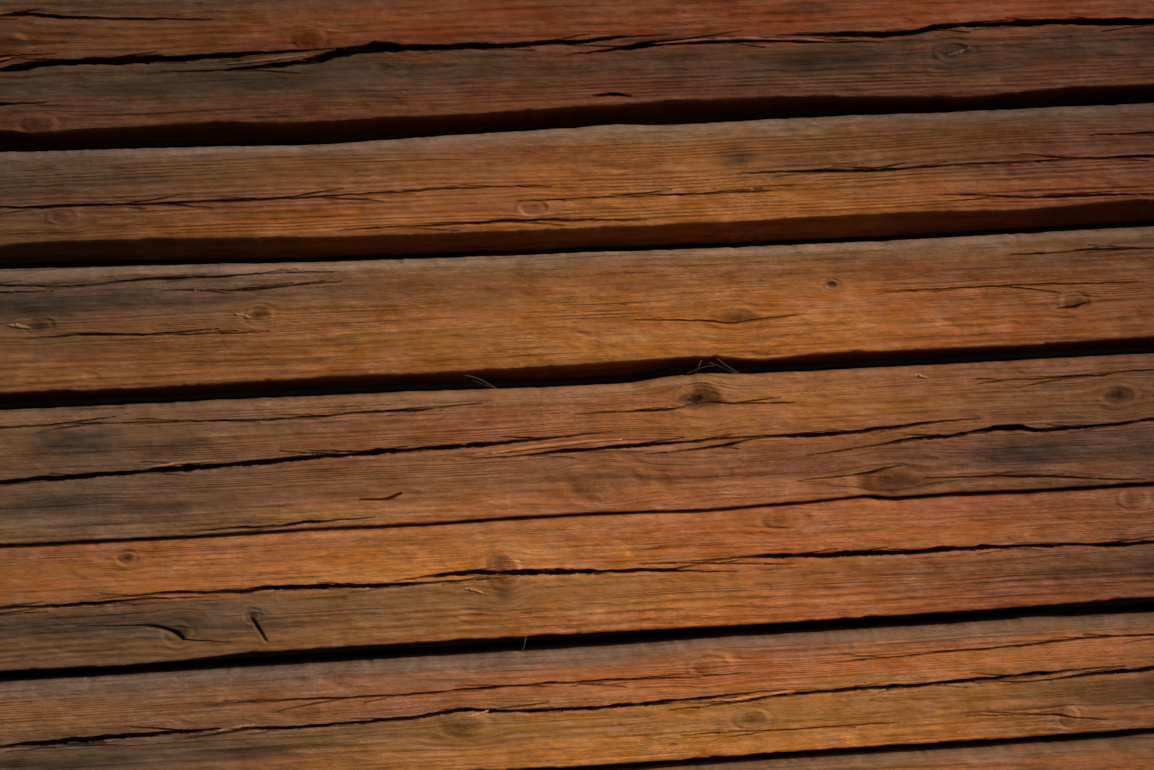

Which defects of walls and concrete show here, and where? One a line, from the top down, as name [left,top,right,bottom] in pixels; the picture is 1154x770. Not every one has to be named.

crack [0,9,214,21]
crack [0,16,1154,74]
crack [0,100,46,108]
crack [976,369,1154,388]
crack [0,397,1154,487]
crack [0,536,1154,641]
crack [0,633,1154,752]